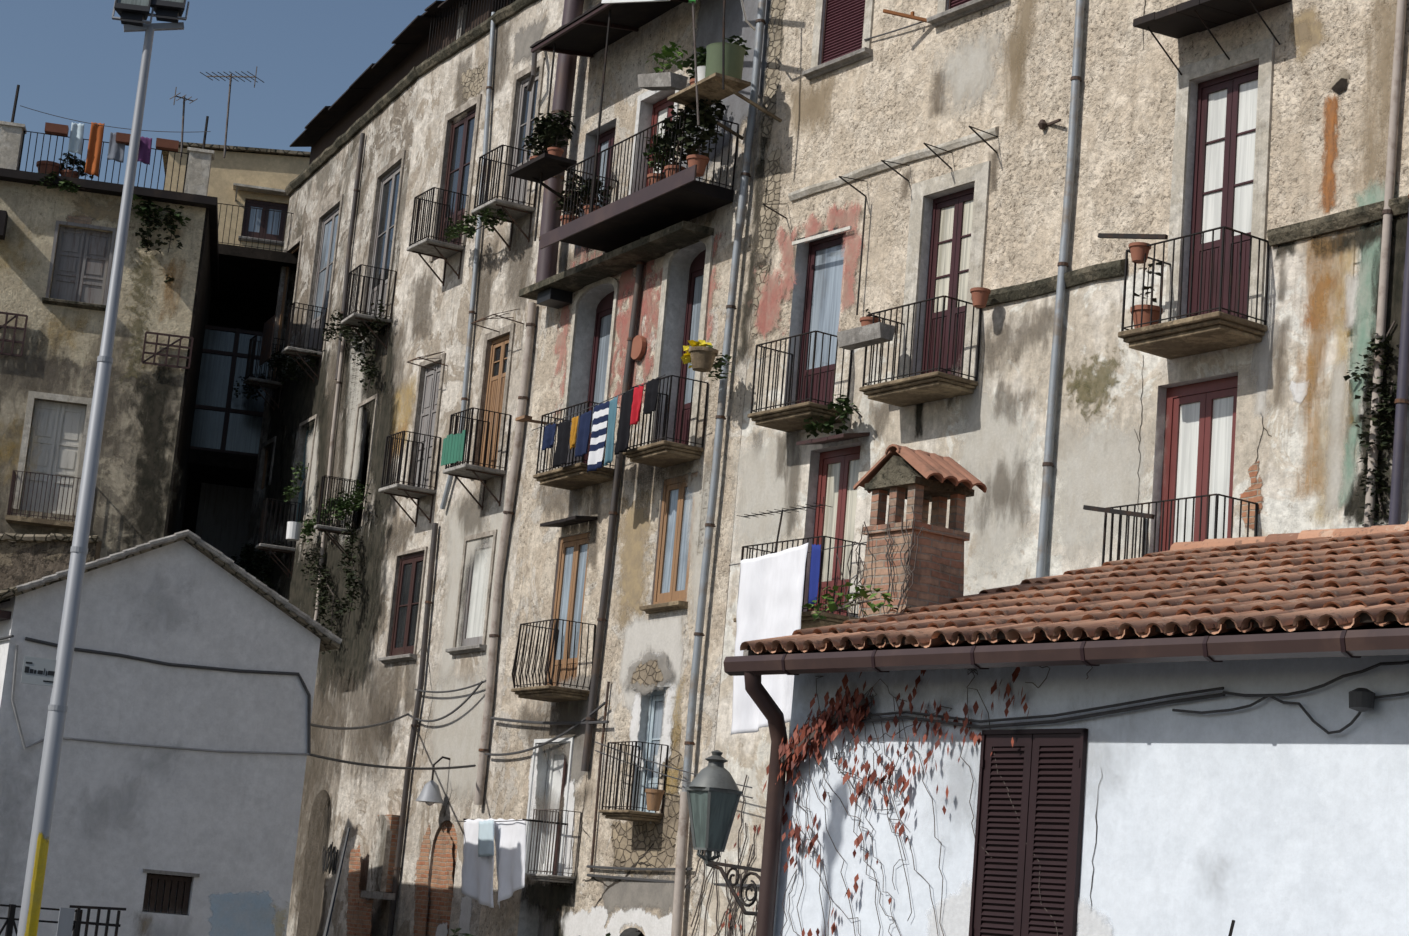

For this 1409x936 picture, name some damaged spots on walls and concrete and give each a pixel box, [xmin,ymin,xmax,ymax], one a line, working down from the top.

flaking render [751,0,862,338]
rust [1321,96,1338,212]
leakage [103,251,180,547]
rust [1306,240,1334,488]
flaking render [1240,461,1263,530]
flaking render [346,842,373,936]
flaking render [414,822,473,936]